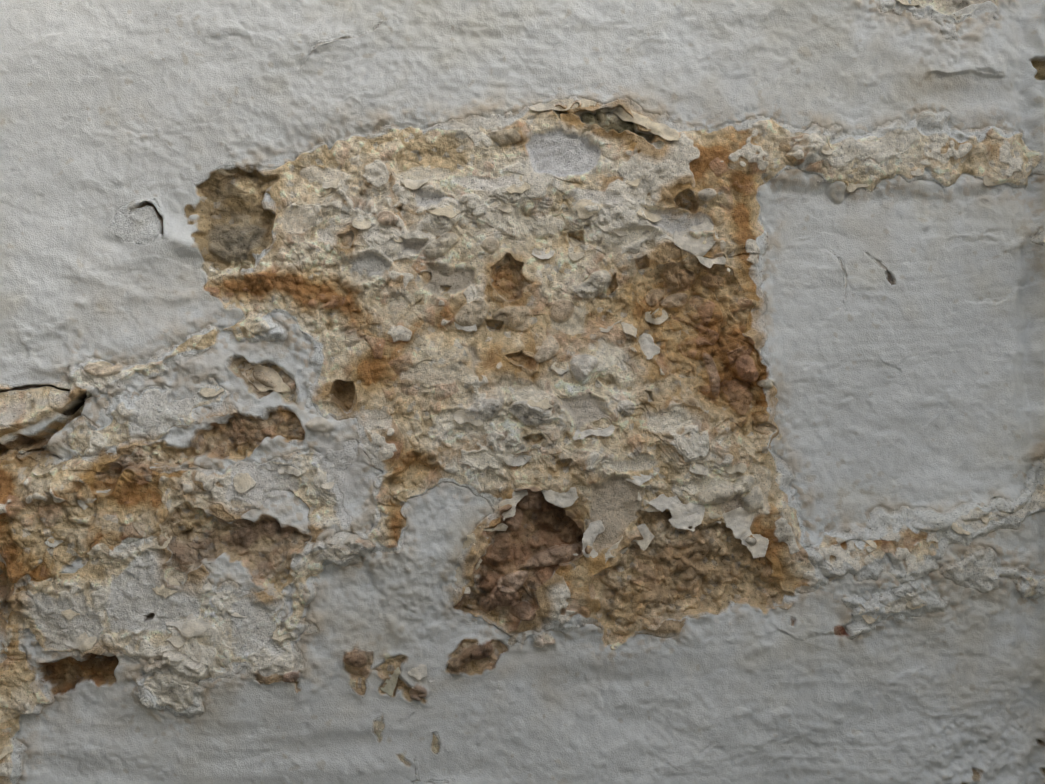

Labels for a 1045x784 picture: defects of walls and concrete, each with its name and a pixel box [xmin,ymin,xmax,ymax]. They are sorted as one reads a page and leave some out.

spalling [877,0,999,41]
peeling [1030,56,1045,81]
spalling [0,96,830,718]
peeling [834,626,850,637]